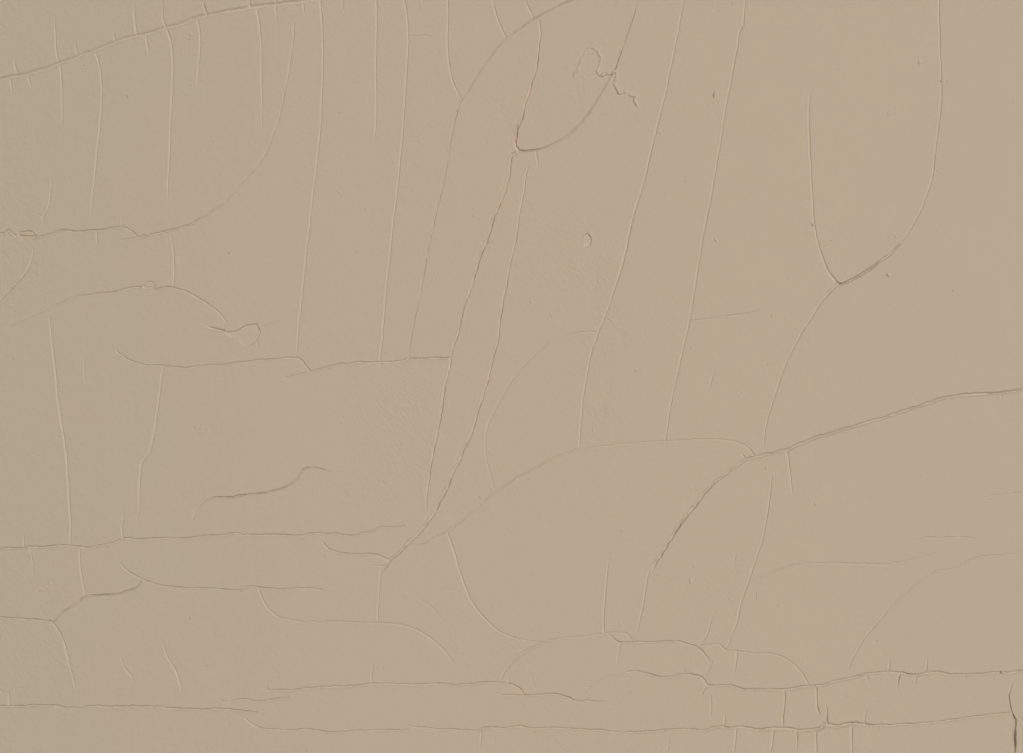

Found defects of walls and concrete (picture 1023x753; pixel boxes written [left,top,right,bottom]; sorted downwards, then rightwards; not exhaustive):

crack [0,693,259,714]
crack [0,0,638,692]
crack [218,0,1023,753]